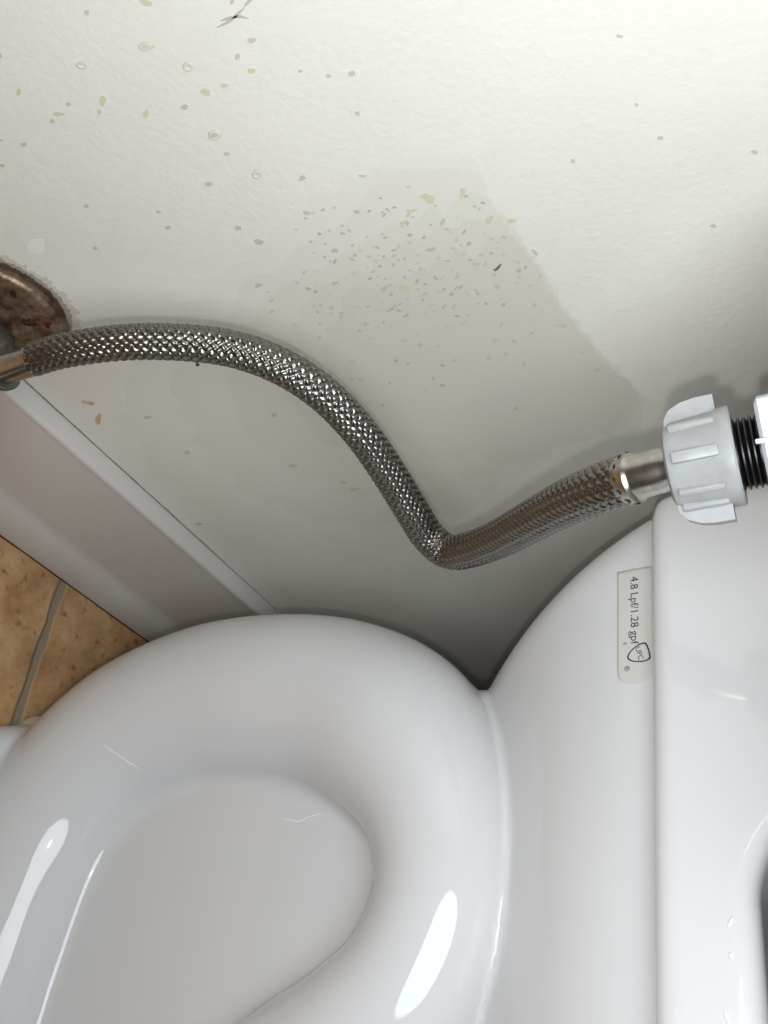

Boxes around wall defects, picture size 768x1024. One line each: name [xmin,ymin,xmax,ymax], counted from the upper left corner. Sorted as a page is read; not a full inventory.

water stain [174,155,656,531]